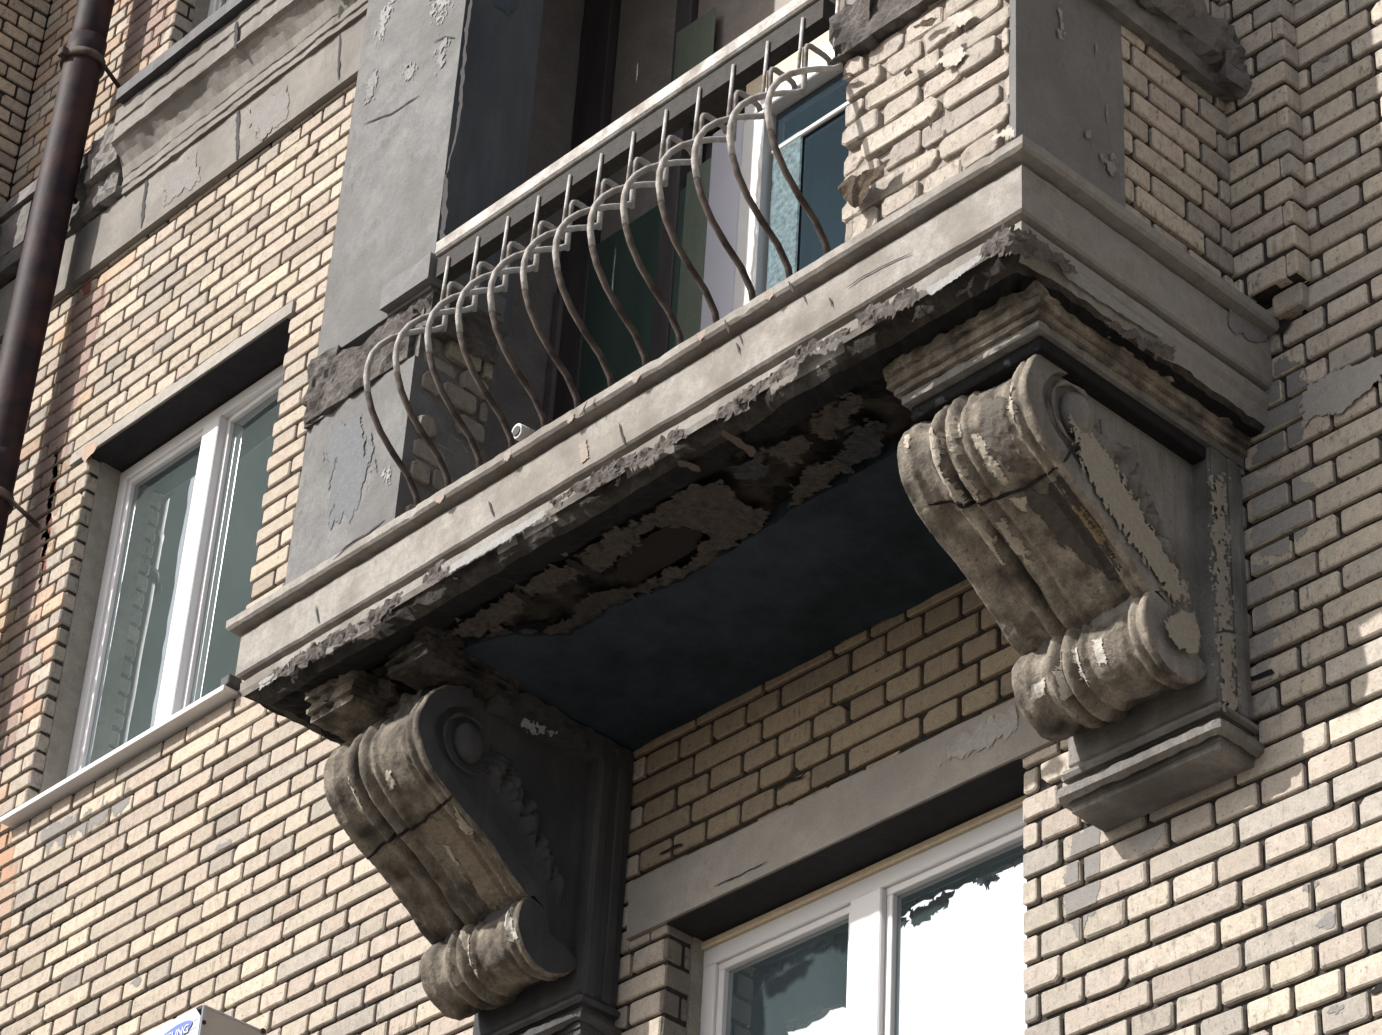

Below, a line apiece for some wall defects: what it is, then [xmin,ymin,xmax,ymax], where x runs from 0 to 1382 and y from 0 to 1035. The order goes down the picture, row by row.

peeling [427,0,454,76]
flaking render [837,0,1010,242]
spalling [410,223,1176,649]
crack [928,442,1079,508]
peeling [1068,413,1274,712]
crack [366,796,453,860]